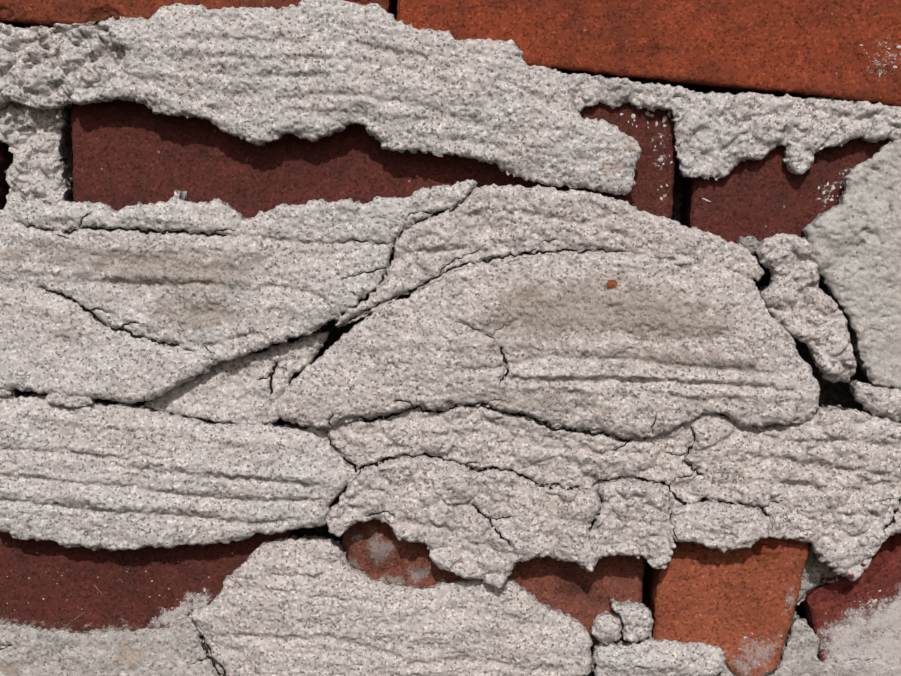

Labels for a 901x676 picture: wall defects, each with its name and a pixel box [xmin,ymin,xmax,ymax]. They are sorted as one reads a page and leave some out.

spalling [84,6,123,24]
crack [13,213,236,239]
crack [313,186,636,334]
crack [38,286,214,362]
crack [257,360,278,395]
crack [316,320,784,541]
crack [471,503,513,551]
crack [882,498,901,534]
spalling [750,542,779,561]
spalling [808,535,901,604]
efflorescence [820,590,901,676]